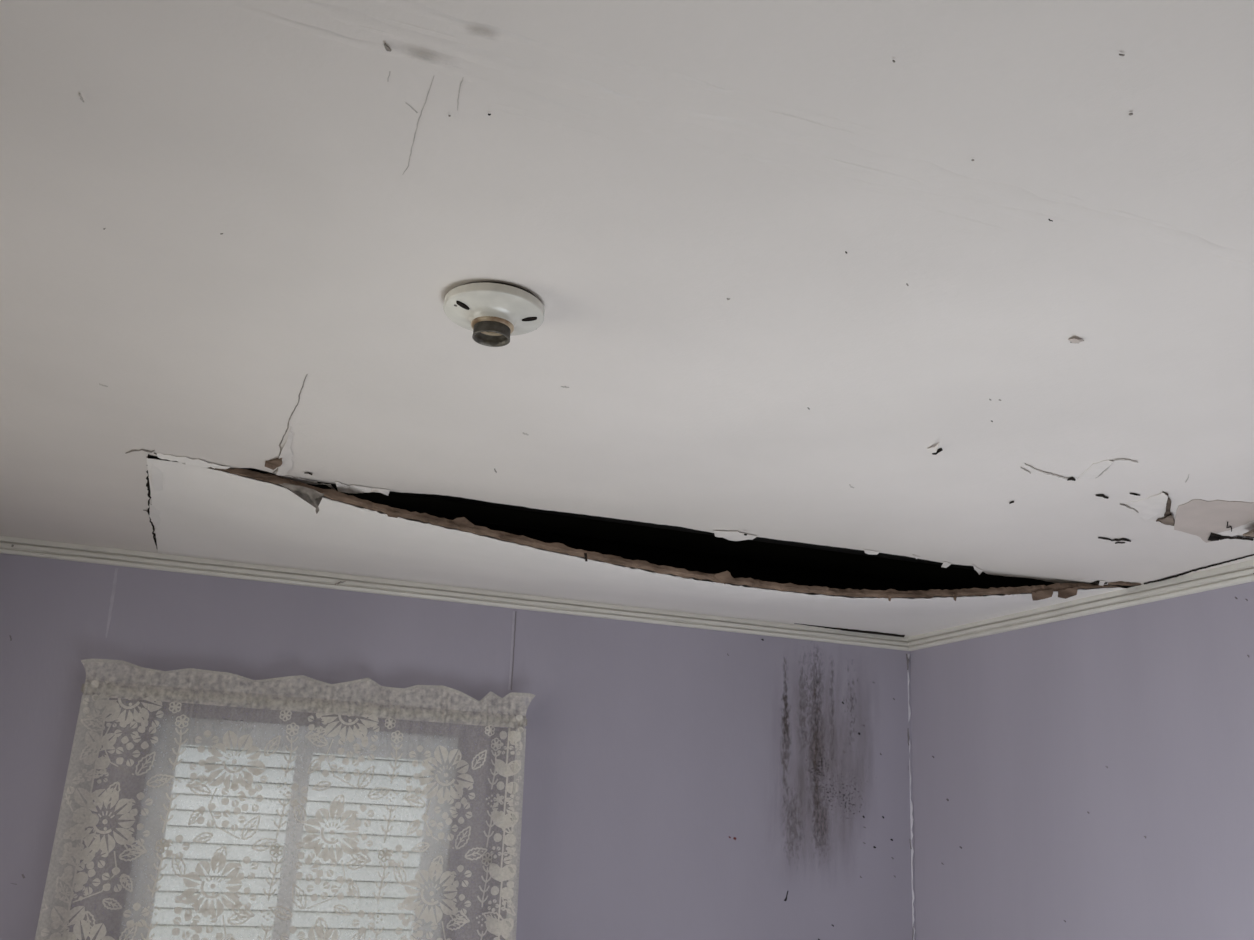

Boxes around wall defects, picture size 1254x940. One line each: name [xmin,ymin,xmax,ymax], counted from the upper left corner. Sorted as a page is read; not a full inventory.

crack [125,449,230,548]
crack [265,374,308,475]
peeling [1020,459,1138,481]
peeling [1096,492,1254,543]